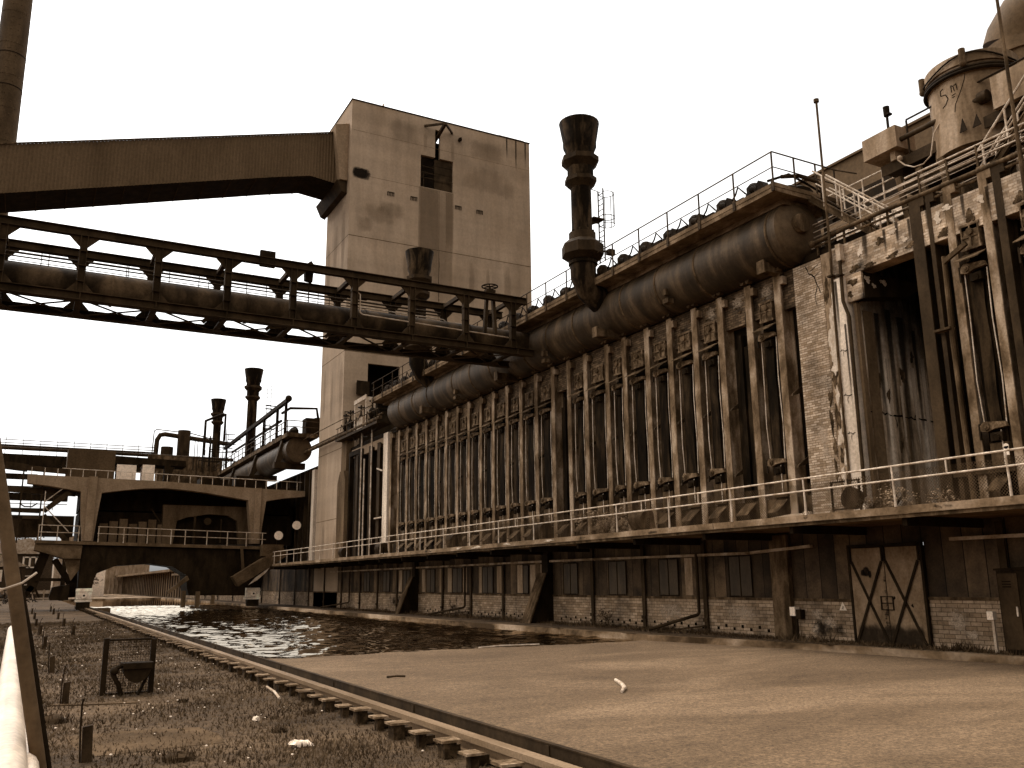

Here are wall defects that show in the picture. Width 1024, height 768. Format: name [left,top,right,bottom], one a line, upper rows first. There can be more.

peeling [934,204,952,238]
spalling [965,195,984,223]
crack [805,262,821,305]
spalling [847,228,914,298]
peeling [824,276,850,485]